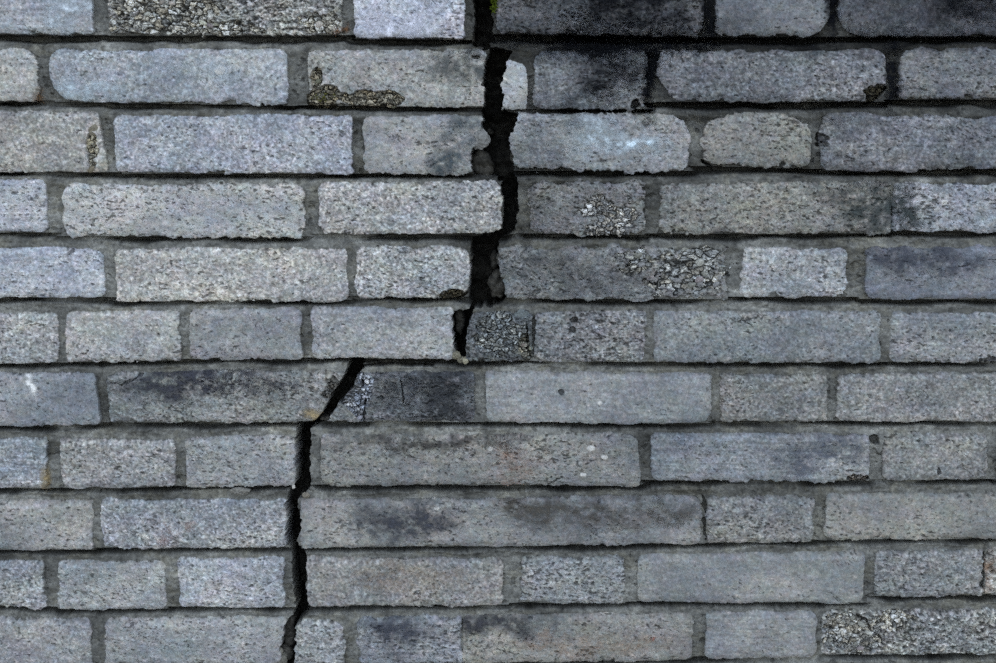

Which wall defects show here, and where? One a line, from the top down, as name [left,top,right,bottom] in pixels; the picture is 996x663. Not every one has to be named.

crack [278,0,519,663]